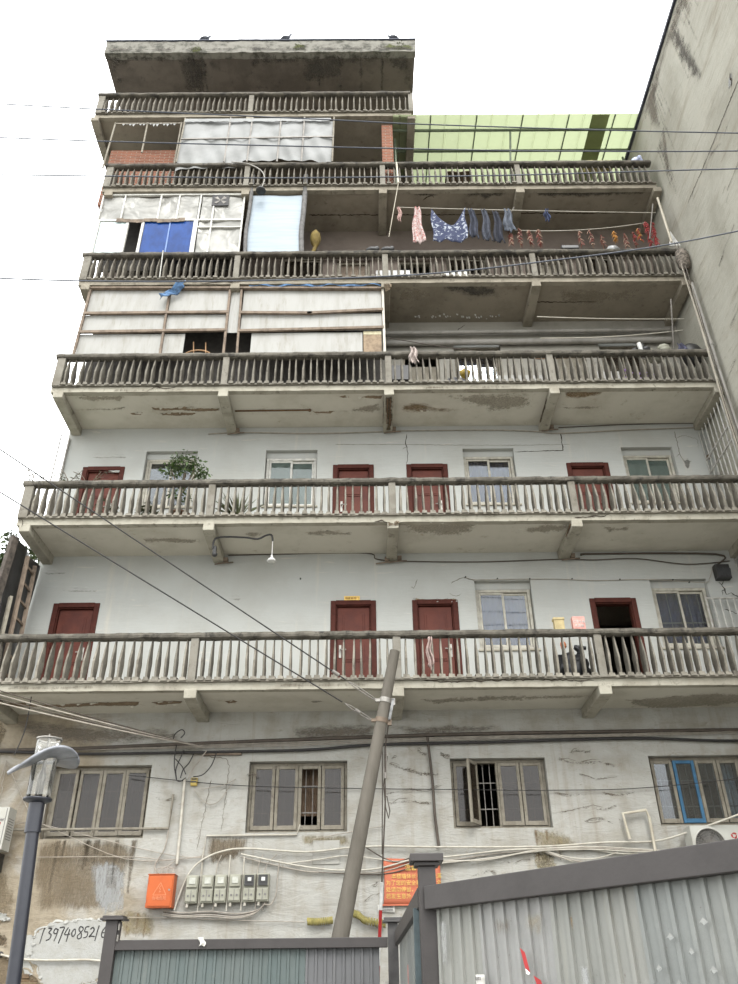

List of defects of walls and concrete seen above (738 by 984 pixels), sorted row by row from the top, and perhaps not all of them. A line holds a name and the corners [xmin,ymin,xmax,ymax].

water stain [180,48,207,90]
water stain [252,47,410,87]
crack [559,748,633,823]
water stain [37,841,136,908]
flaking render [0,933,10,984]